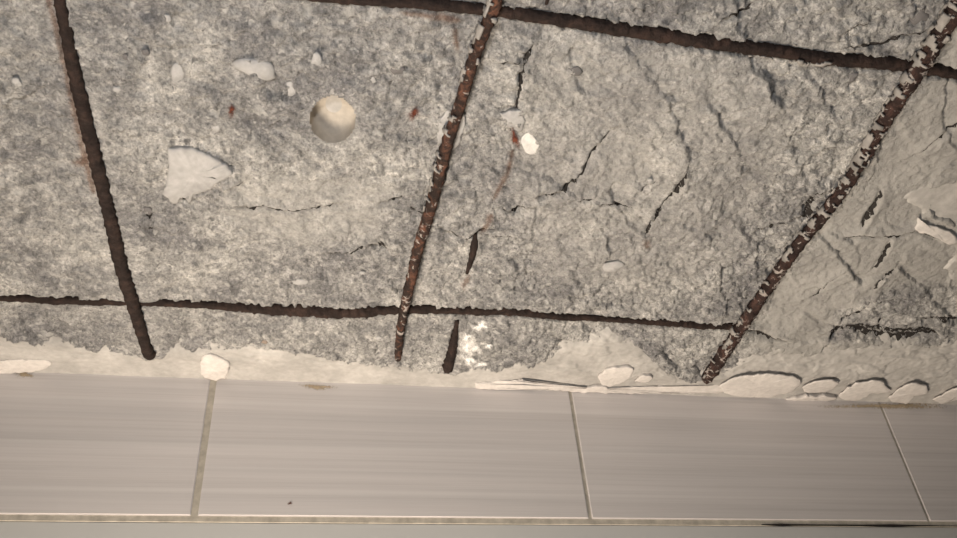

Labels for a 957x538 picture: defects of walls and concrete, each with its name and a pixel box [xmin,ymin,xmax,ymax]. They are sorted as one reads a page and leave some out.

crack [844,24,925,48]
crack [502,45,533,109]
spalling [0,0,957,404]
crack [451,205,525,240]
crack [545,133,688,234]
crack [758,193,823,230]
crack [830,190,956,341]